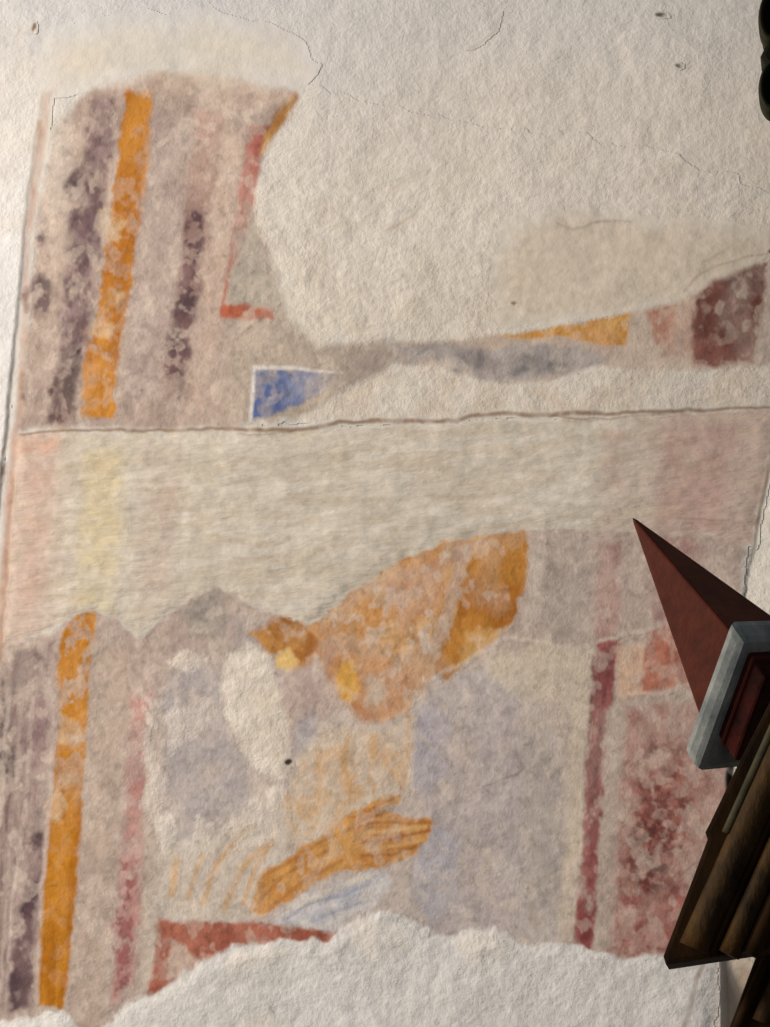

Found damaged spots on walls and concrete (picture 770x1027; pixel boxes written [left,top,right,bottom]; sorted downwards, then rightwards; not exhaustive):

crack [0,94,770,516]
crack [752,442,770,550]
crack [467,765,526,798]
crack [722,767,737,793]
crack [661,856,701,896]
crack [679,964,708,1027]